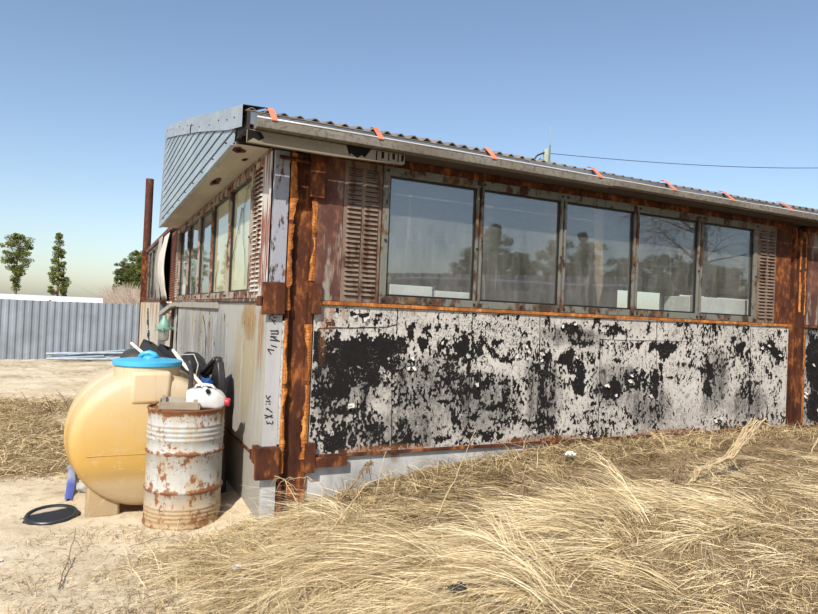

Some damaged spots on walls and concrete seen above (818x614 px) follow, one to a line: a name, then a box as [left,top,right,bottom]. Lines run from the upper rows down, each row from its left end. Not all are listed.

rust [279,153,299,474]
rust [300,324,313,459]
rust [308,201,318,281]
peeling [309,307,787,454]
rust [798,235,808,315]
peeling [804,329,818,424]